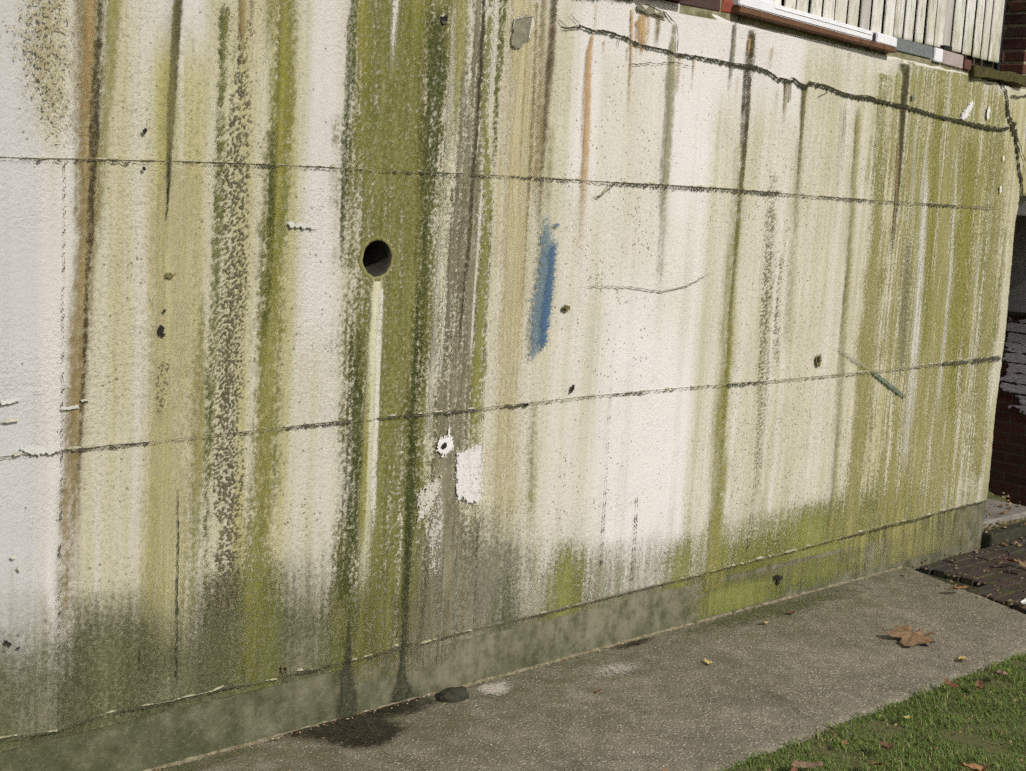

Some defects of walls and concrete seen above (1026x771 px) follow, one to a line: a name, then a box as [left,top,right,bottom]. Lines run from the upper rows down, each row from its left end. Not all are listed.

spalling [511,14,536,49]
rust [582,34,605,201]
rust [627,9,661,84]
crack [558,9,1026,203]
leakage [53,0,306,737]
leakage [280,0,557,748]
crack [0,155,996,763]
leakage [661,23,944,591]
leakage [936,142,1004,476]
peeling [1000,317,1026,414]
leakage [545,544,586,620]
leakage [0,649,43,752]